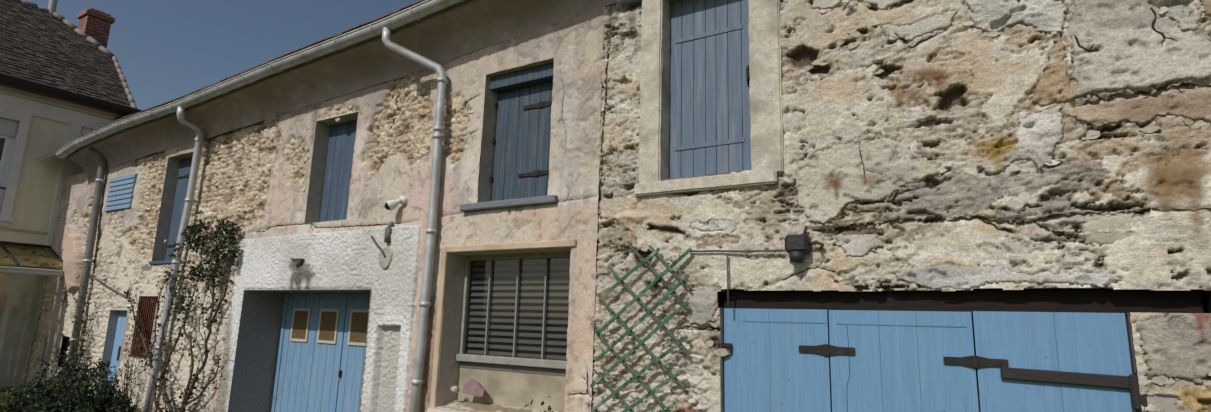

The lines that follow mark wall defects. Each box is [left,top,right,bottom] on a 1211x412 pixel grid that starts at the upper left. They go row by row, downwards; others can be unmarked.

crack [1151,7,1177,43]
flaking render [187,119,313,239]
flaking render [316,75,474,183]
crack [558,13,612,225]
corrosion [980,139,1013,167]
peeling [811,0,1211,176]
corrosion [1148,152,1199,209]